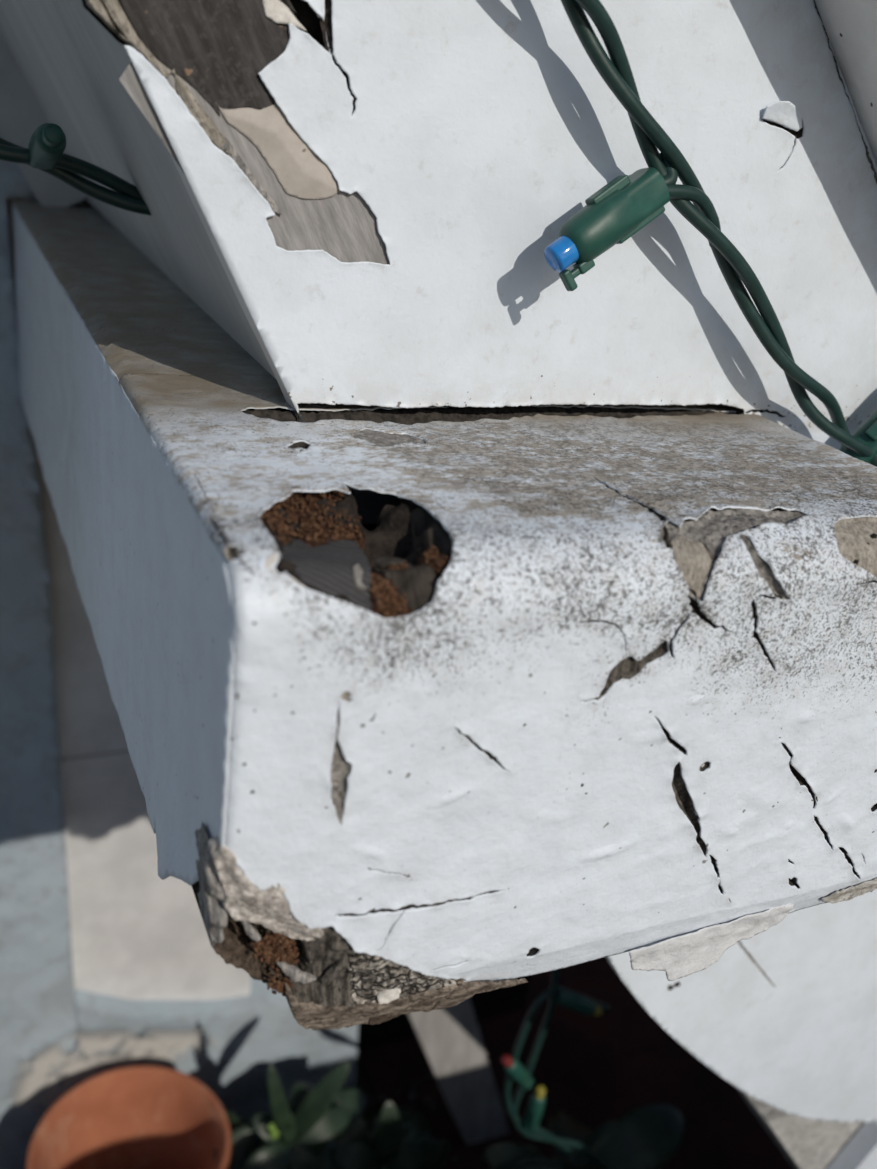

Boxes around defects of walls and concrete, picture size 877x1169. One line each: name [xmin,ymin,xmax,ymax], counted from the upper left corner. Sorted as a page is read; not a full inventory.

crack [320,0,357,114]
peeling [82,0,390,265]
crack [584,482,806,701]
spalling [738,532,788,600]
peeling [834,517,877,585]
peeling [331,692,352,824]
crack [454,727,506,770]
crack [655,717,730,901]
crack [779,737,864,878]
spalling [191,821,528,1030]
crack [338,875,497,932]
peeling [16,1033,211,1111]